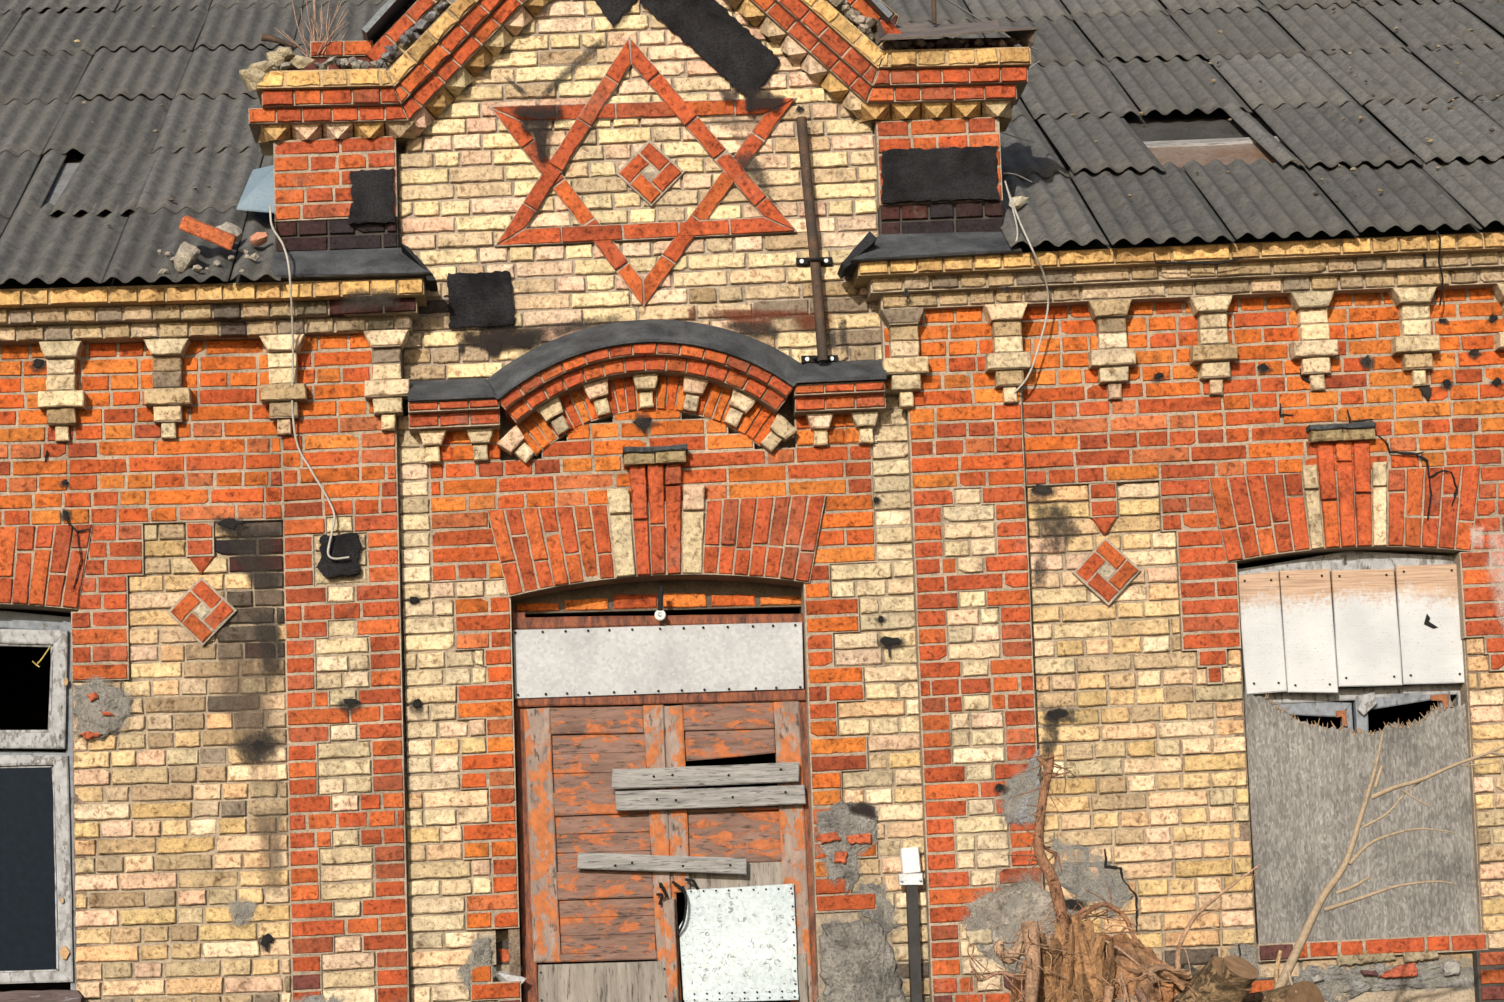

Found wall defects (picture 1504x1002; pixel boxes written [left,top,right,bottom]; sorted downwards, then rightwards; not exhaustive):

damp [222,610,282,744]
peeling [79,692,115,740]
peeling [966,929,994,945]